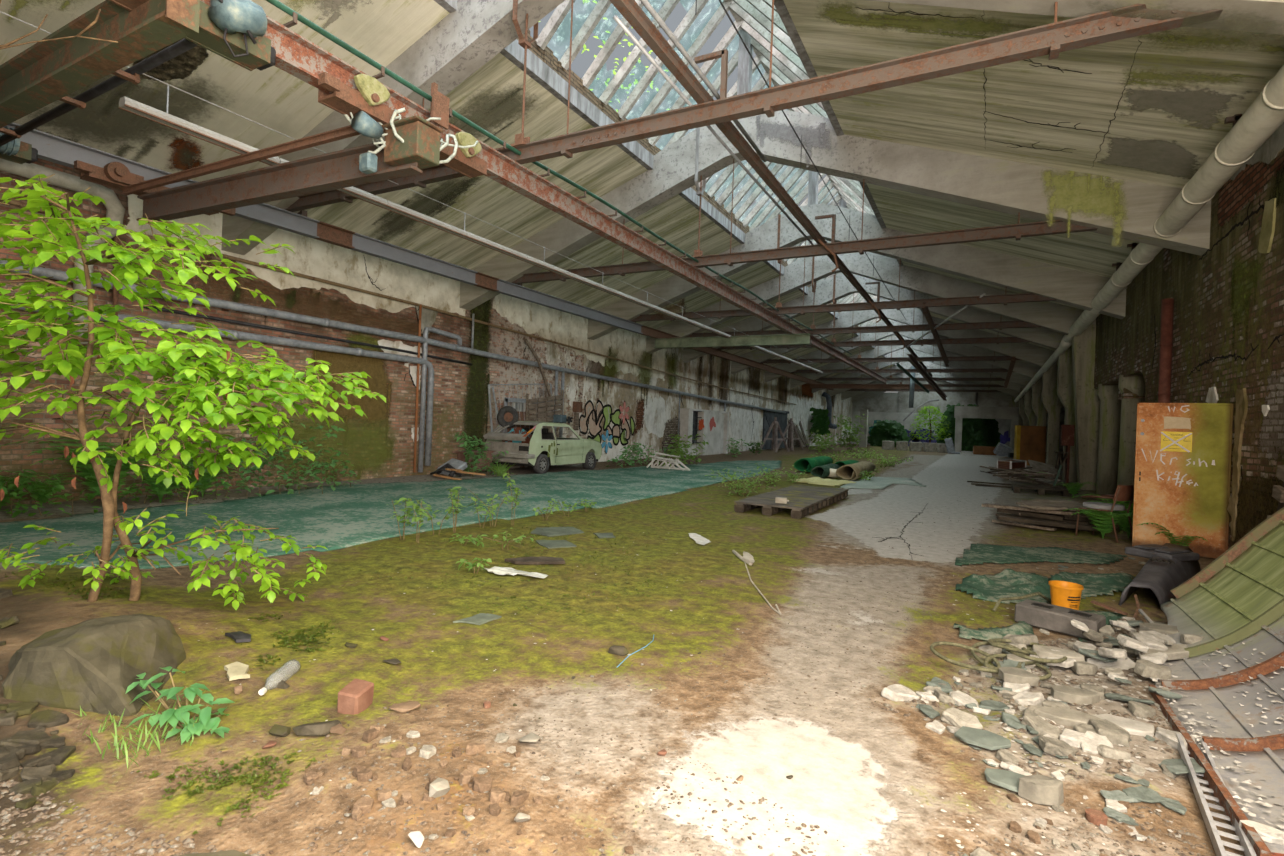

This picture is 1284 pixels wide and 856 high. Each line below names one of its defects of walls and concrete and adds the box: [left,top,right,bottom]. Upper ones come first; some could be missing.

water stain [315,0,354,29]
rust [119,104,280,171]
crack [856,6,1142,168]
spalling [1217,123,1284,227]
rust [336,188,731,338]
peeling [493,293,680,454]
crack [875,507,925,557]